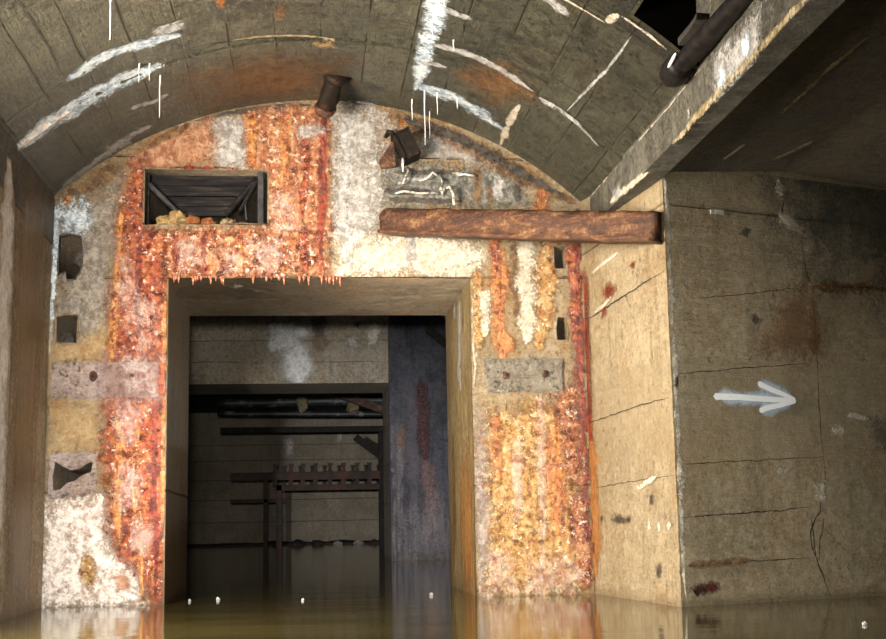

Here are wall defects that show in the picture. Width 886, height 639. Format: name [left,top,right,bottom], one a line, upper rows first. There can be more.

leakage [17,62,161,150]
leakage [67,21,184,80]
leakage [412,0,533,145]
spalling [56,233,84,281]
crack [586,270,664,320]
leakage [0,103,311,615]
rust [62,102,342,605]
rust [447,240,601,596]
crack [591,397,668,422]
crack [678,178,886,596]
spalling [48,452,98,499]
rust [692,582,720,597]